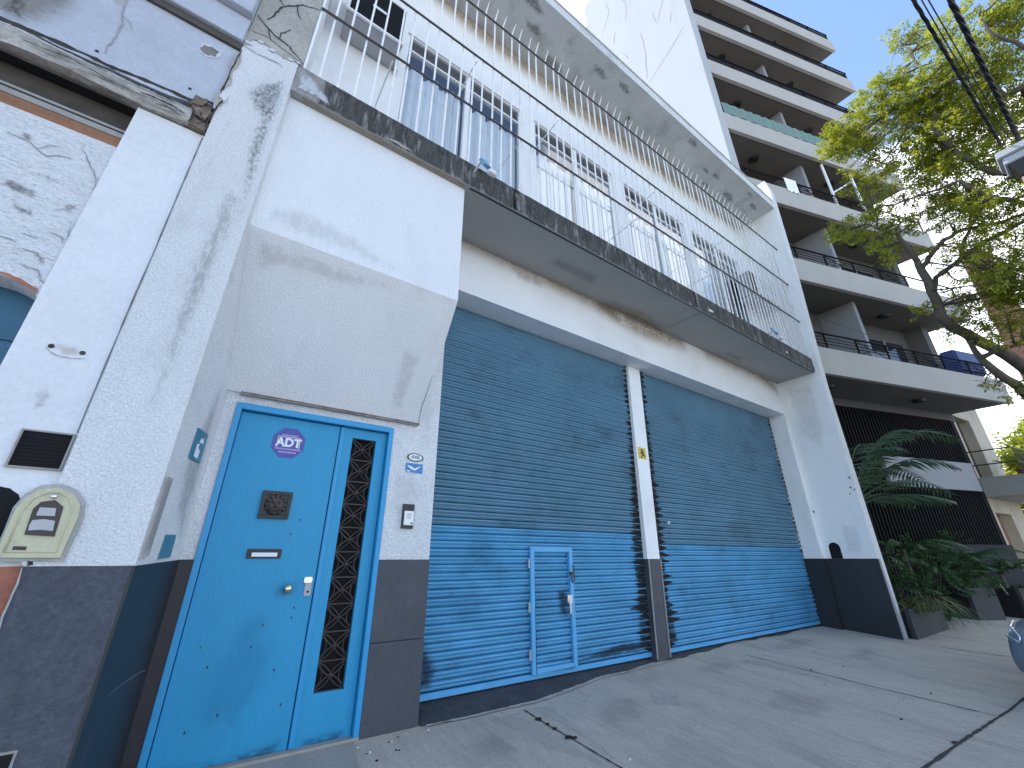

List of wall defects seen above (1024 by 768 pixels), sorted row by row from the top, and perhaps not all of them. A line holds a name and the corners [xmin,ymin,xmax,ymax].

crack [7,131,97,189]
crack [0,0,185,116]
spalling [0,16,305,136]
crack [244,0,319,66]
leakage [444,0,730,223]
crack [0,227,71,283]
leakage [318,81,815,371]